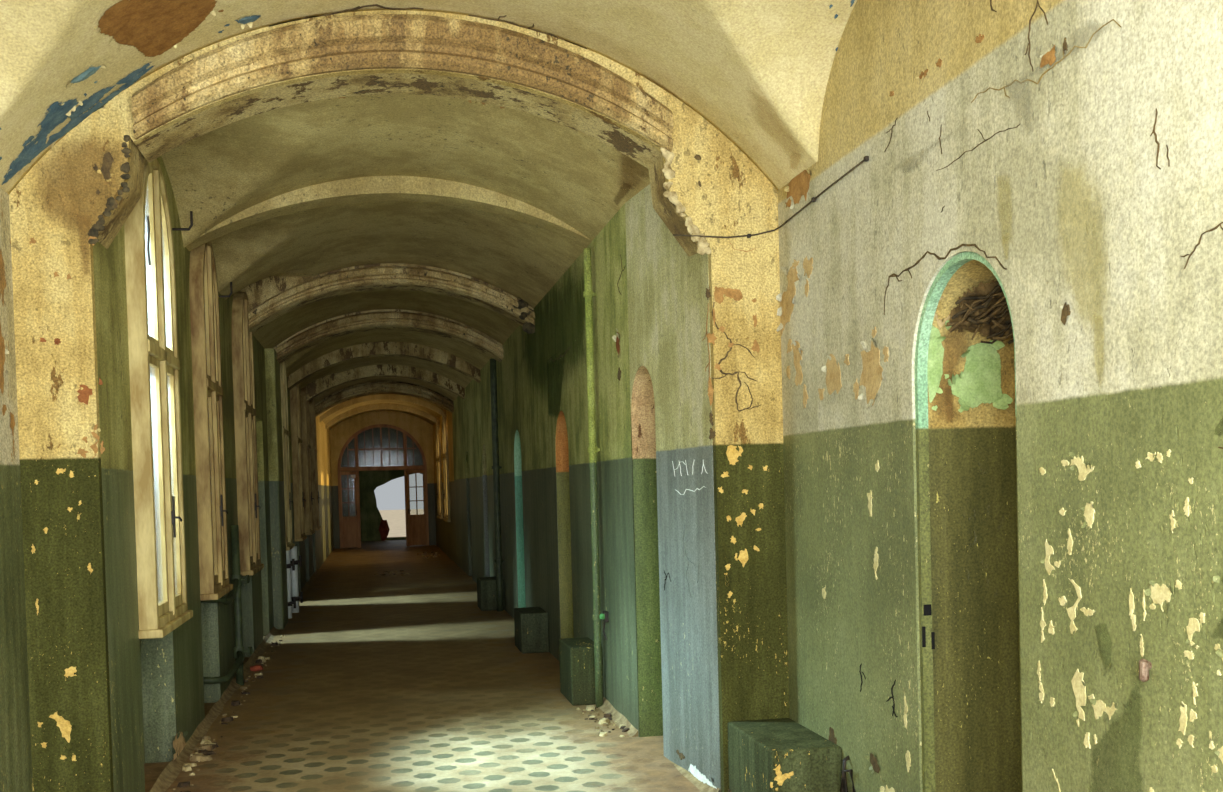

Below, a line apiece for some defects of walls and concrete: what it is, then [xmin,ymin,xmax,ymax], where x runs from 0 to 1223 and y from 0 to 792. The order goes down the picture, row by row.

peeling [0,0,262,186]
crack [927,0,1121,171]
crack [884,244,1007,315]
crack [1181,222,1223,269]
crack [702,302,760,412]
peeling [927,280,1014,413]
peeling [724,503,763,598]
peeling [1040,501,1095,643]
peeling [1129,580,1182,657]
peeling [1183,612,1205,660]
peeling [1071,669,1117,749]
peeling [1176,682,1198,749]